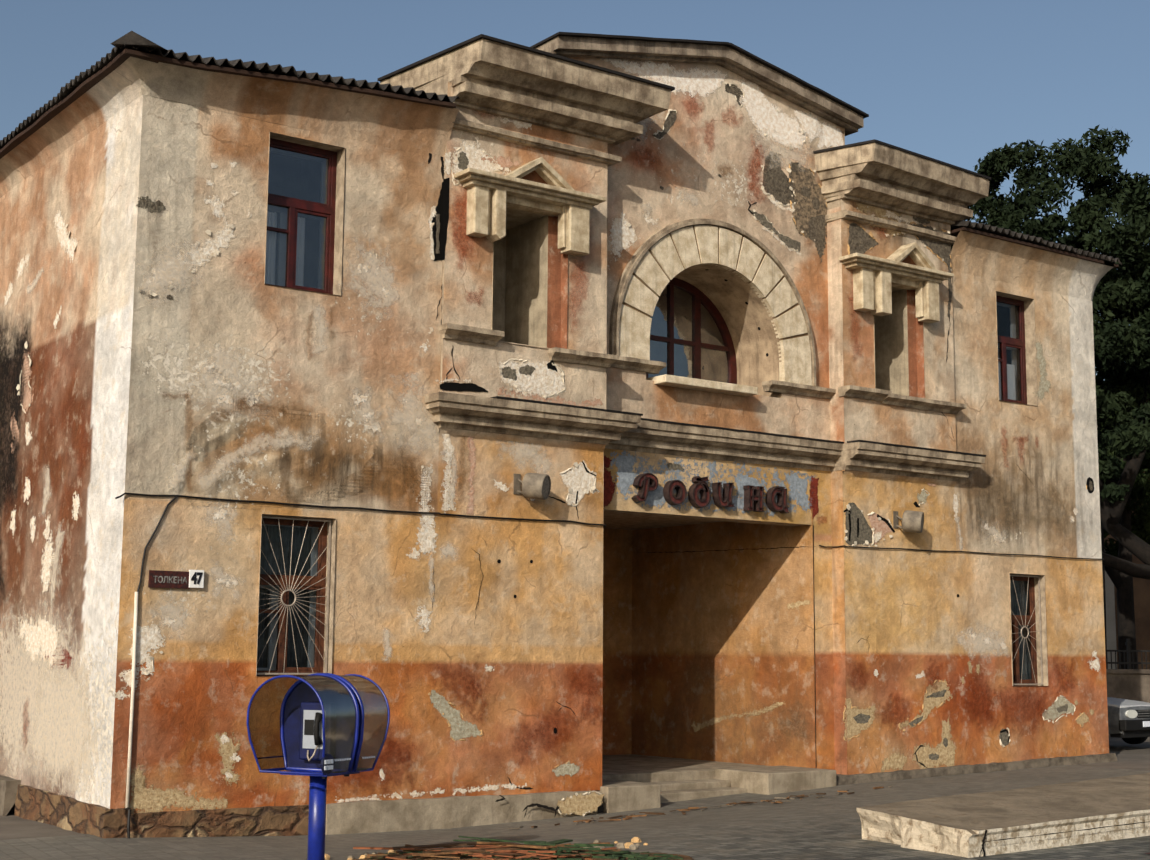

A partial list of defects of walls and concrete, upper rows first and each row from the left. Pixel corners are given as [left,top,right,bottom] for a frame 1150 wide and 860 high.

peeling [600,58,844,264]
peeling [136,161,253,303]
spalling [428,138,523,261]
damp [0,324,25,505]
flaking render [435,357,603,407]
peeling [502,441,665,509]
flaking render [844,502,895,548]
flaking render [428,690,483,741]
flaking render [881,628,1009,772]
flaking render [1042,695,1094,728]
flaking render [557,790,604,816]
crack [979,821,1150,857]